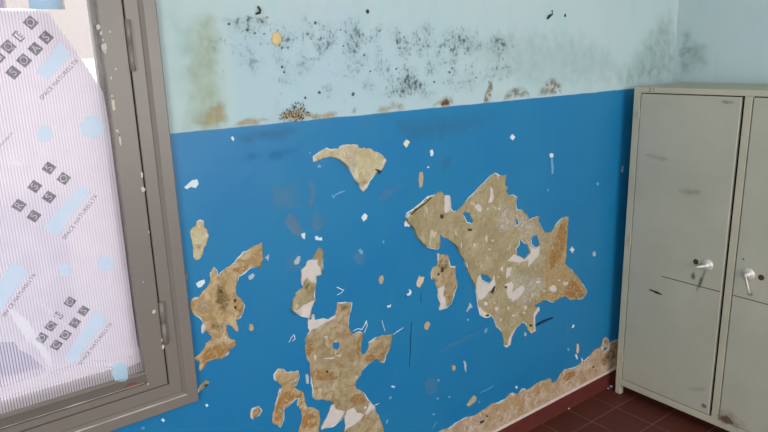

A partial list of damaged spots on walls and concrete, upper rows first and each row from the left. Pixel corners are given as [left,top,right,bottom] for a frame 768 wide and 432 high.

water stain [279,96,332,122]
peeling [309,144,387,192]
peeling [190,219,209,260]
peeling [189,243,269,372]
peeling [272,236,393,432]
peeling [404,173,587,347]
flaking render [439,337,618,432]